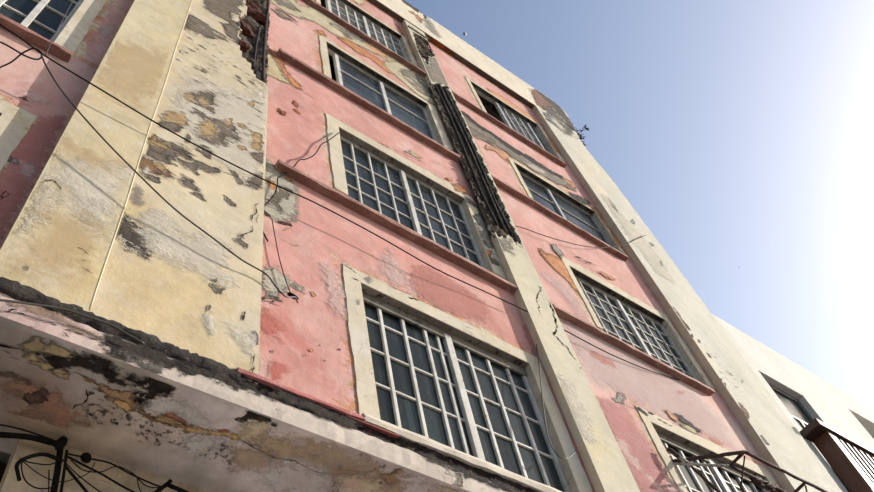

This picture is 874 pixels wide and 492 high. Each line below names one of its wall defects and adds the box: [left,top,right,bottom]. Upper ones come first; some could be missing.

peeling [15,0,591,267]
crack [536,290,573,356]
flaking render [16,336,87,380]
damp [9,302,361,429]
damp [86,404,191,448]
flaking render [72,377,282,459]
flaking render [664,409,702,435]
crack [235,436,333,475]
flaking render [331,466,414,492]